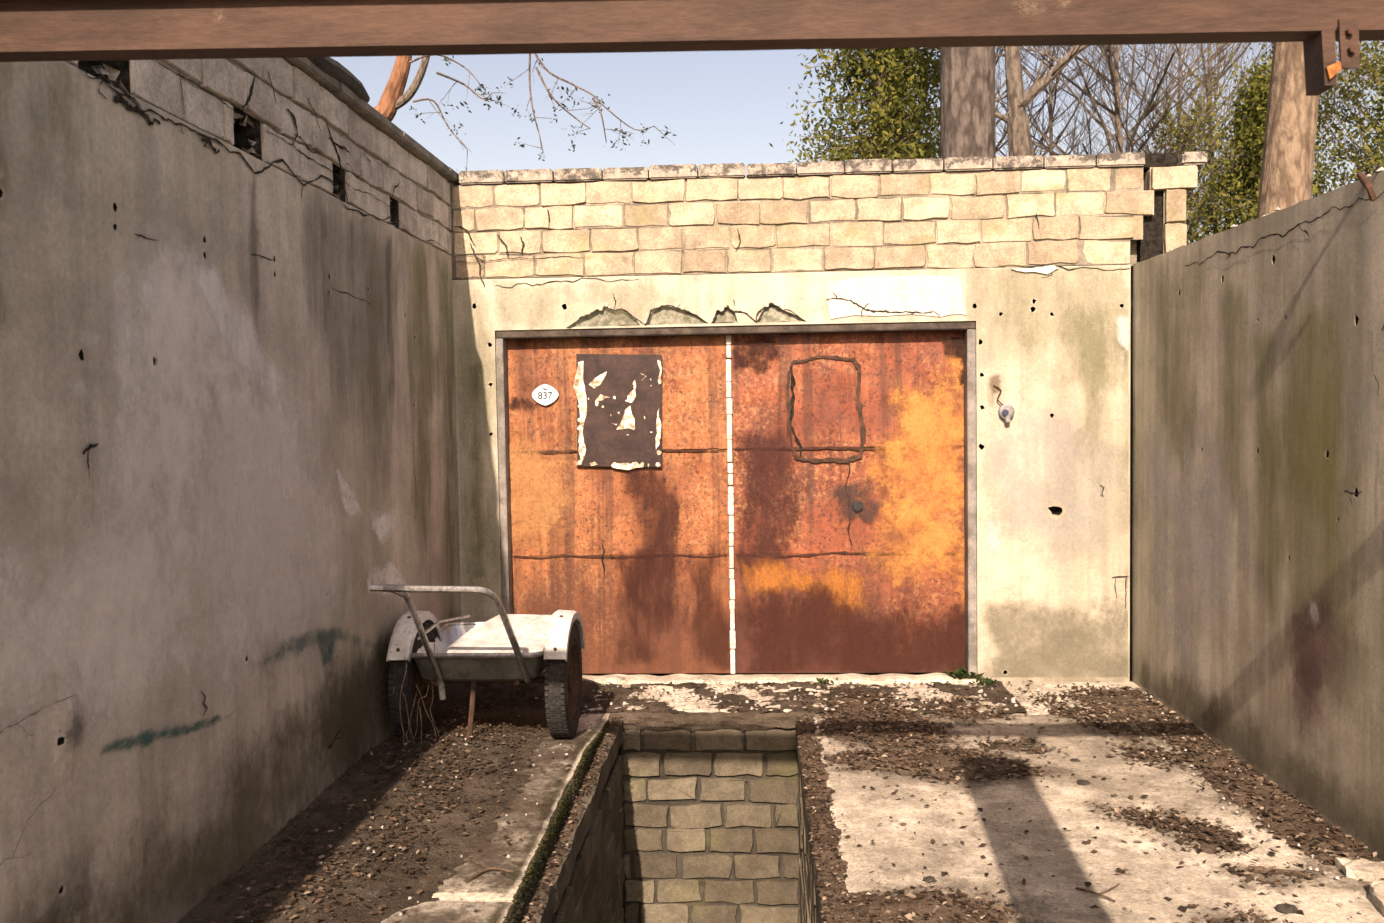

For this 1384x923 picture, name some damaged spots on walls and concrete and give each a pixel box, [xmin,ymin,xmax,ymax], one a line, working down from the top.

crack [78,67,940,328]
crack [1185,192,1384,267]
spalling [568,301,737,327]
spalling [757,299,806,322]
corrosion [733,337,778,372]
corrosion [944,338,964,384]
corrosion [509,397,536,409]
corrosion [835,482,879,522]
corrosion [514,551,962,559]
crack [0,694,78,736]